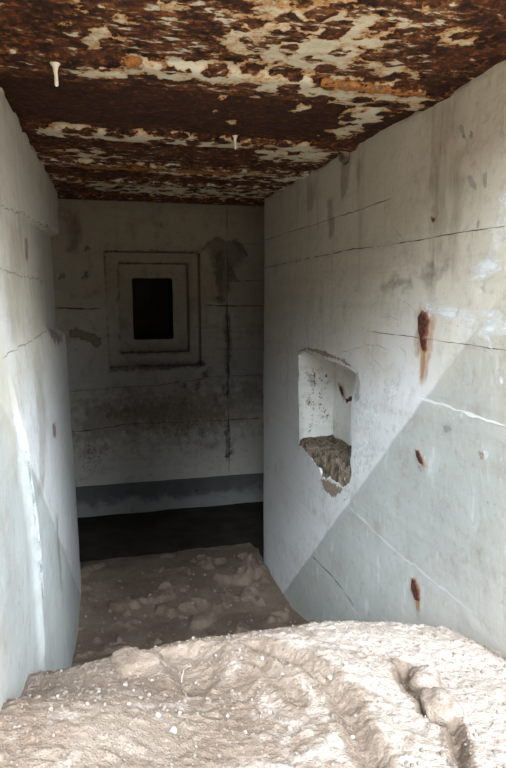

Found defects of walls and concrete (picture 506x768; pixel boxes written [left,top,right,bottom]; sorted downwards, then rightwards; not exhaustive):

rust [120,55,143,70]
rust [319,75,432,99]
peeling [47,327,101,347]
crack [71,198,505,461]
rust [418,311,430,352]
spalling [300,348,350,366]
spalling [321,479,348,499]
crack [313,557,361,618]
rust [411,578,420,601]